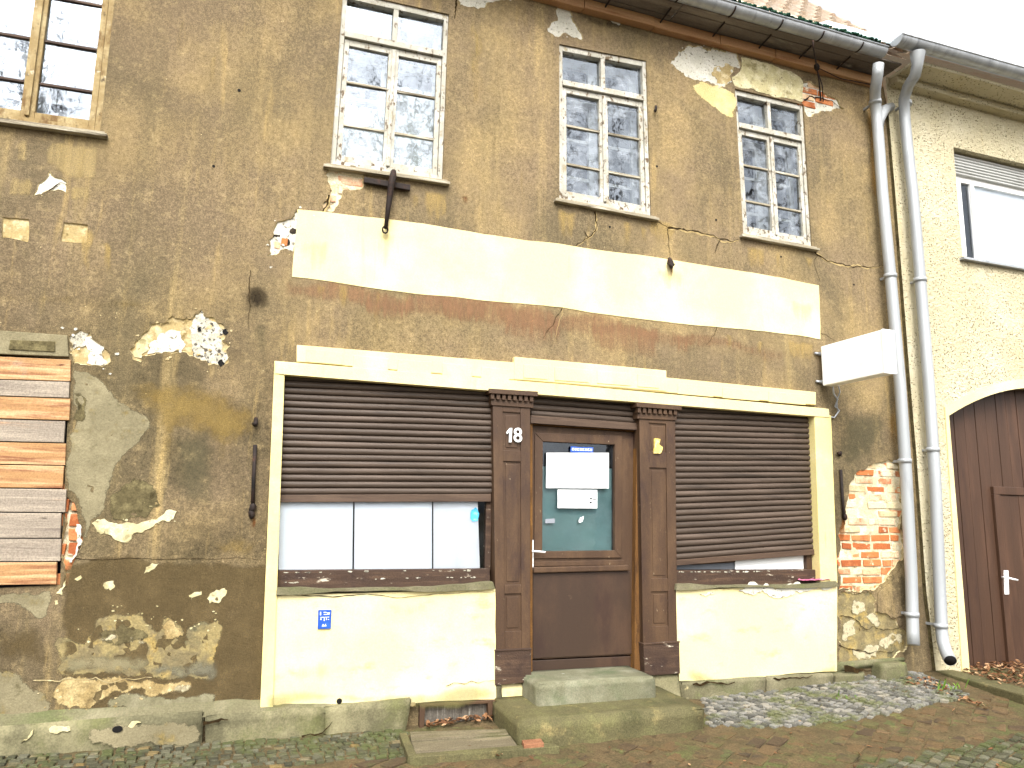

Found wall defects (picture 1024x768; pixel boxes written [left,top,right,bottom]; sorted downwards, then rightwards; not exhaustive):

peeling [547,7,583,40]
peeling [671,45,844,117]
spalling [313,165,364,216]
spalling [2,217,29,242]
spalling [266,206,302,268]
crack [576,212,598,247]
crack [657,221,738,252]
crack [814,252,883,280]
peeling [61,304,232,375]
spalling [50,478,177,605]
spalling [679,459,908,662]
peeling [33,588,227,710]